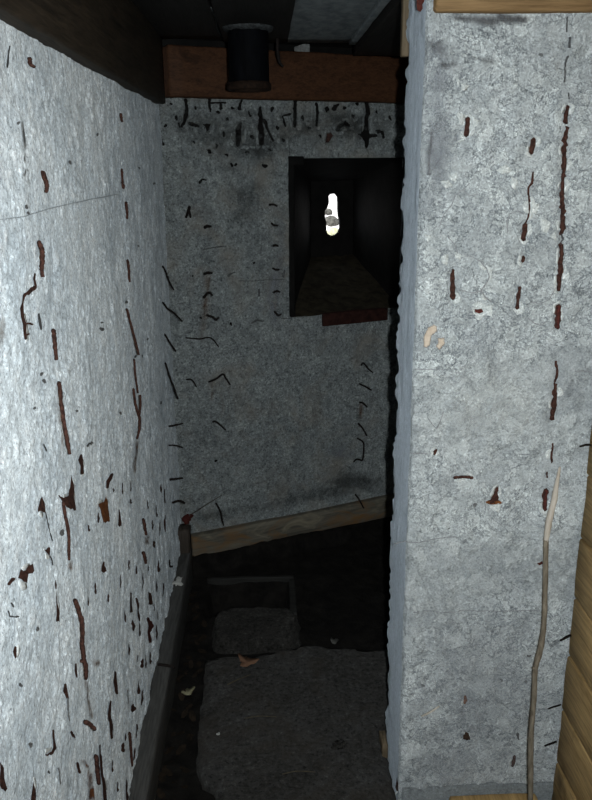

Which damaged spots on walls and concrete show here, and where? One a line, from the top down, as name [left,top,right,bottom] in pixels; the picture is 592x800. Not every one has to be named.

peeling [424,325,444,349]
spalling [38,381,85,569]
spalling [88,473,132,531]
spalling [8,563,34,591]